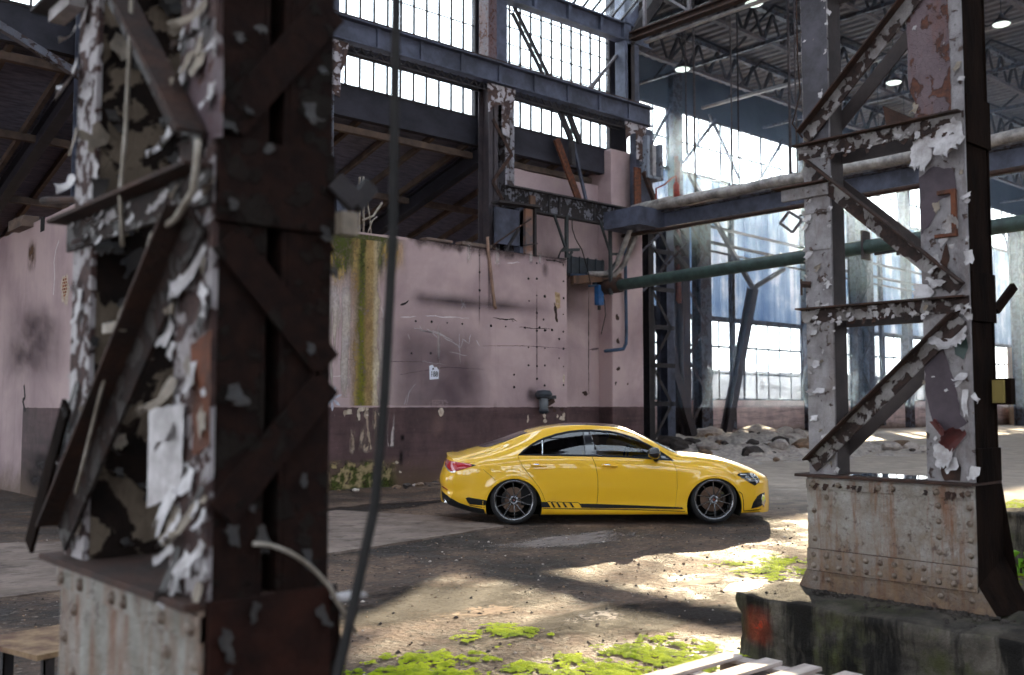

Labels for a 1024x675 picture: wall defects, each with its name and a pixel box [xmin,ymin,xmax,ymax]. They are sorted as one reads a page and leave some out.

peeling [158,0,217,91]
peeling [796,0,831,121]
corrosion [906,0,951,118]
peeling [53,174,76,194]
peeling [68,109,125,199]
peeling [69,184,179,279]
peeling [859,116,974,320]
leakage [16,318,47,364]
peeling [155,241,210,360]
leakage [329,234,399,490]
peeling [922,303,980,481]
peeling [130,354,207,614]